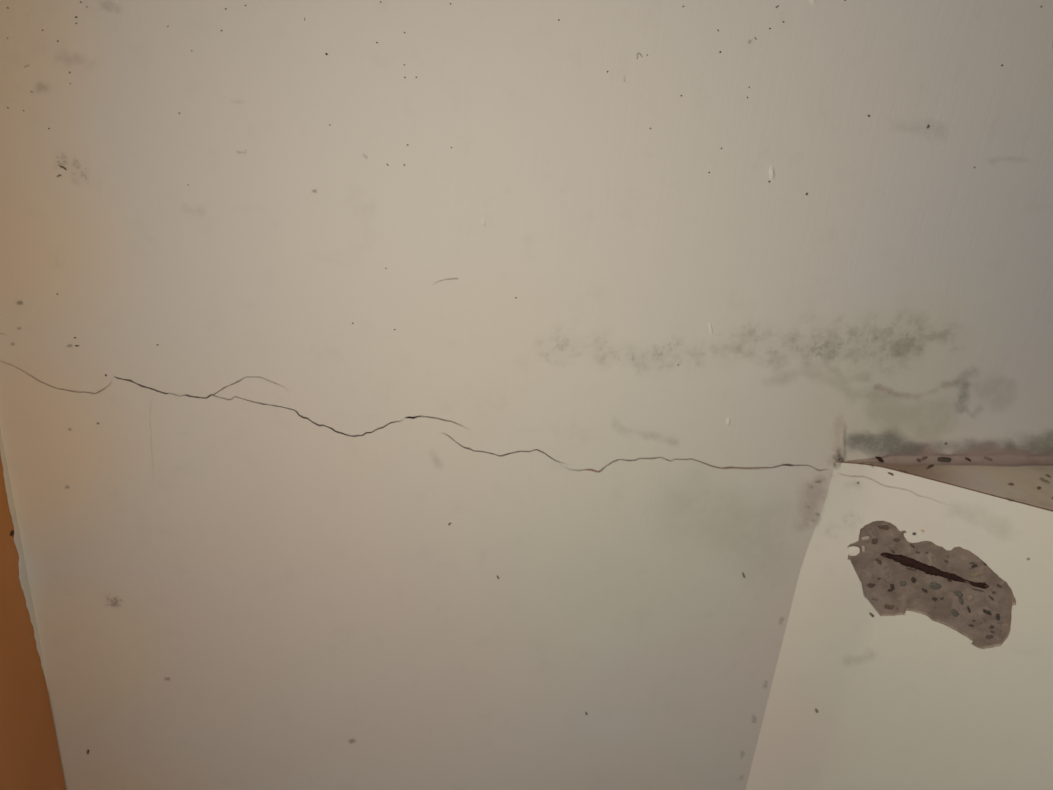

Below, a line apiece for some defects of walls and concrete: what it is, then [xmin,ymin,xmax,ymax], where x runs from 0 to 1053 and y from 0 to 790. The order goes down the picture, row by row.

crack [116,377,556,461]
spalling [848,521,1016,649]